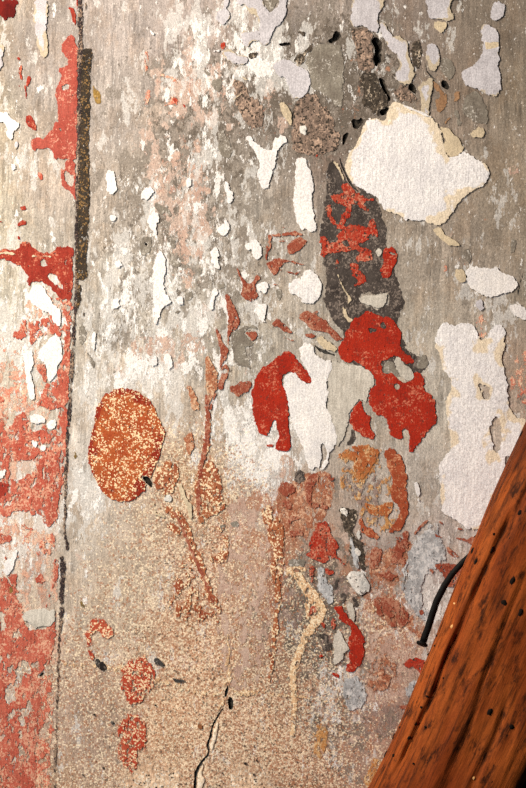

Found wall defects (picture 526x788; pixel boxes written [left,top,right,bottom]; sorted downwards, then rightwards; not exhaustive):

peeling [213,0,287,65]
flaking render [273,31,364,156]
peeling [350,0,449,116]
peeling [425,0,454,21]
peeling [454,1,505,126]
peeling [359,293,387,308]
peeling [0,236,96,788]
crack [193,685,228,788]